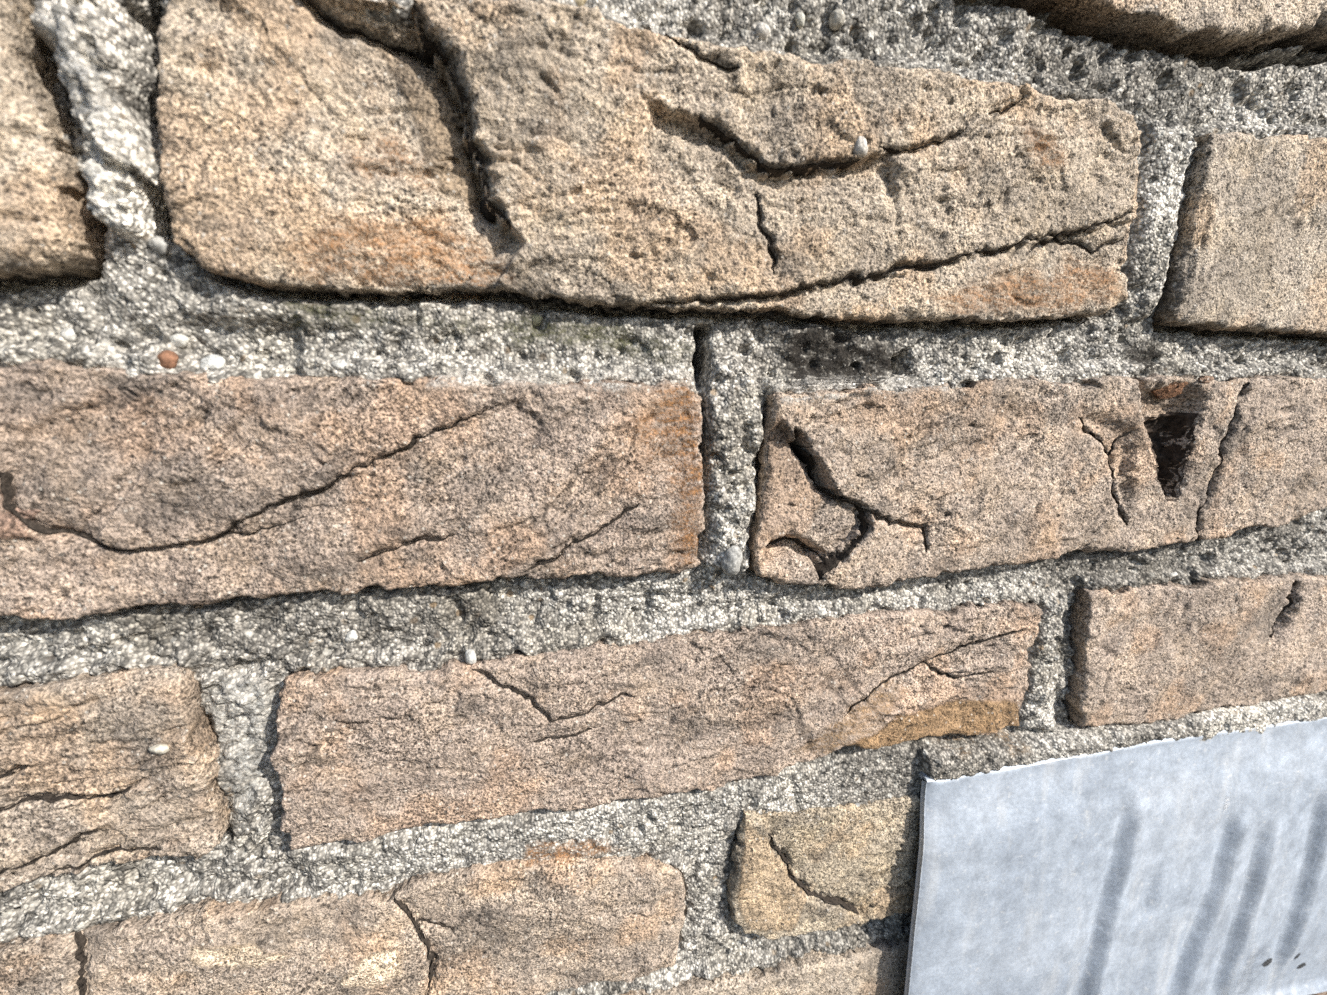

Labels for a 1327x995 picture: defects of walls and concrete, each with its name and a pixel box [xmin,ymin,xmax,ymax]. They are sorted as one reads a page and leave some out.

crack [664,32,741,71]
crack [305,0,511,230]
crack [654,98,1133,304]
peeling [1151,376,1214,399]
crack [0,403,502,552]
crack [358,534,455,561]
crack [762,430,927,581]
crack [1078,417,1132,525]
crack [1195,382,1250,541]
crack [472,669,636,743]
crack [0,765,161,877]
crack [768,833,860,915]